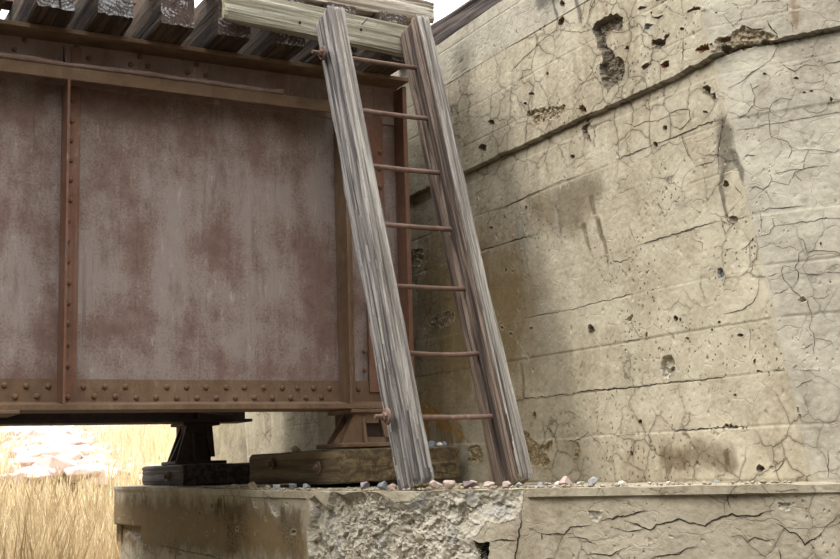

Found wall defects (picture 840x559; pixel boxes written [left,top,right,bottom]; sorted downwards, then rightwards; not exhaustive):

spalling [591,11,630,97]
spalling [694,23,797,57]
spalling [528,103,567,129]
spalling [578,104,594,144]
crack [612,0,840,388]
crack [482,236,530,251]
crack [528,294,631,318]
crack [516,361,723,444]
spalling [523,430,555,470]
spalling [290,489,524,559]
crack [489,493,840,559]